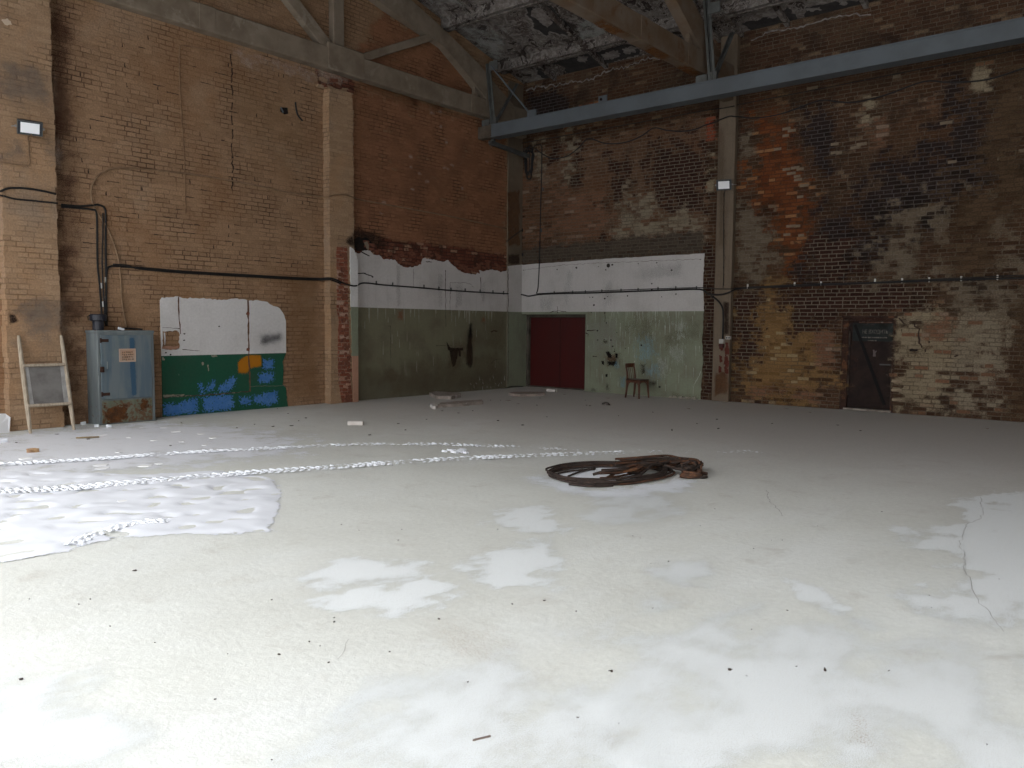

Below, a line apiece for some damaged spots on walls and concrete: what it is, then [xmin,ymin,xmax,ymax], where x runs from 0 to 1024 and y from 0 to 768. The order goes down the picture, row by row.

peeling [525,5,571,38]
peeling [536,44,640,78]
crack [228,54,236,191]
spalling [336,223,507,403]
crack [898,318,930,352]
peeling [163,355,279,416]